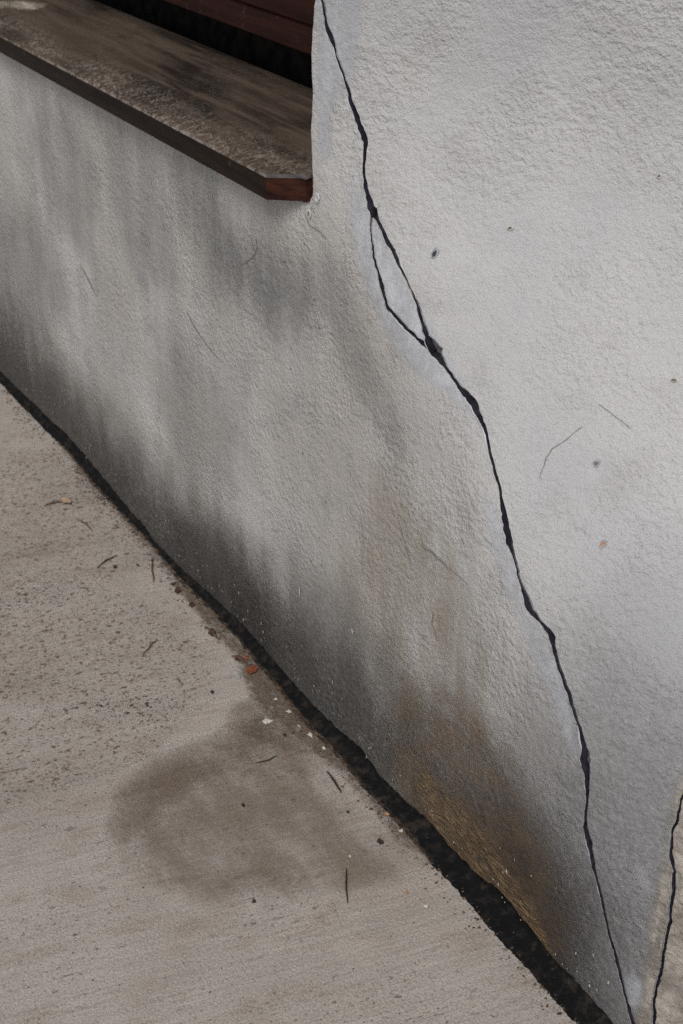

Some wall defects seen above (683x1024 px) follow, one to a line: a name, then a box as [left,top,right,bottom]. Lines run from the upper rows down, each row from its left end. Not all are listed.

leakage [0,329,264,645]
crack [321,0,683,1024]
leakage [441,790,664,1024]